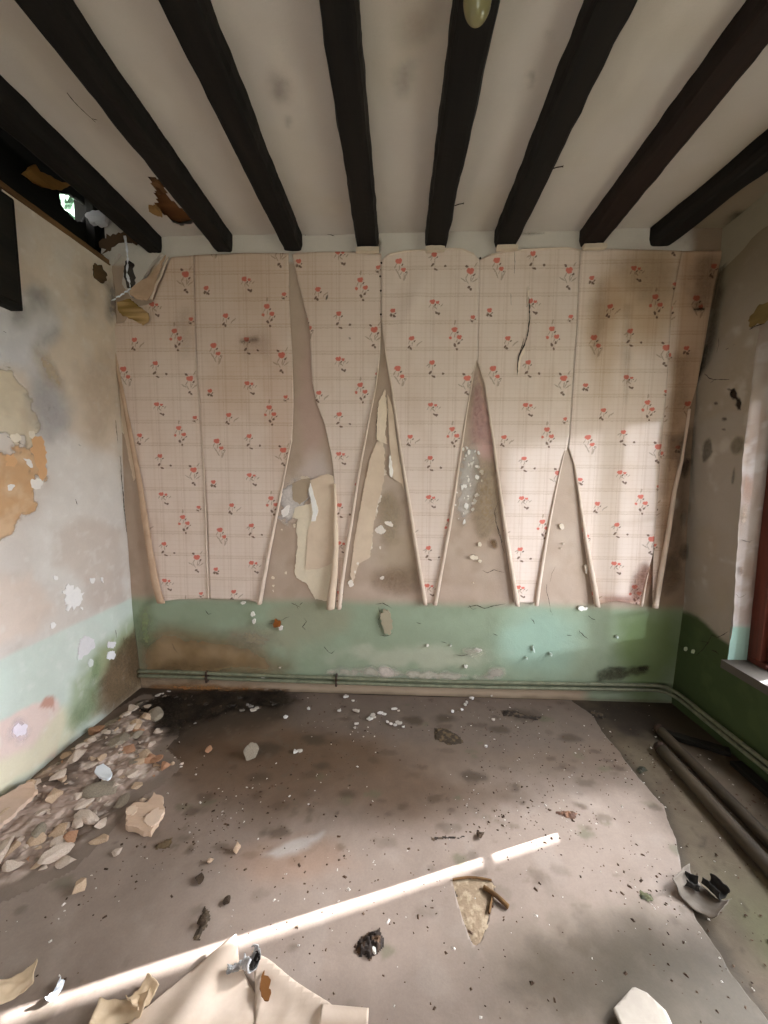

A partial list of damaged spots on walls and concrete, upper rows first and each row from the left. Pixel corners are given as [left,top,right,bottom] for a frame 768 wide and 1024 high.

spalling [148,177,191,223]
flaking render [92,232,138,288]
peeling [0,370,47,540]
leakage [679,435,689,479]
peeling [455,446,483,524]
peeling [306,474,359,610]
peeling [371,495,393,549]
peeling [53,576,104,612]
leakage [633,568,650,598]
leakage [104,608,276,702]
leakage [599,666,648,681]